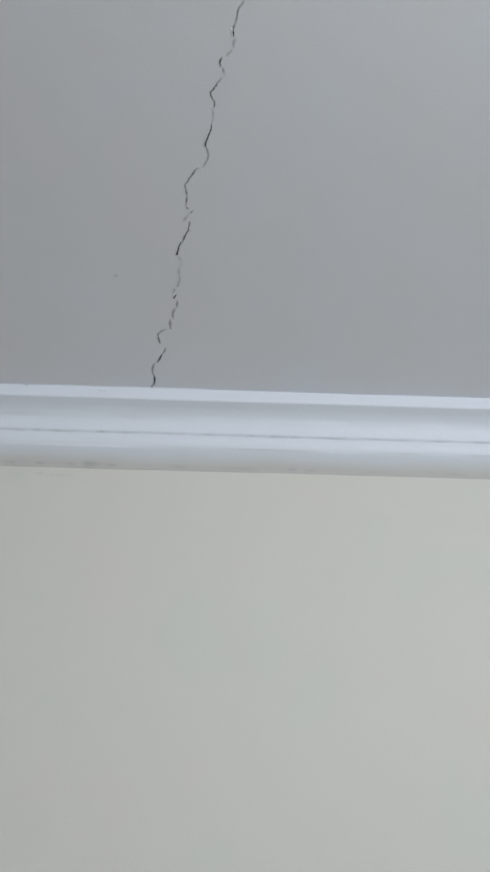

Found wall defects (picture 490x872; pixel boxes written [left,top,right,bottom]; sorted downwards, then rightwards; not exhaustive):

crack [203,59,221,147]
crack [174,179,189,256]
crack [149,338,162,387]